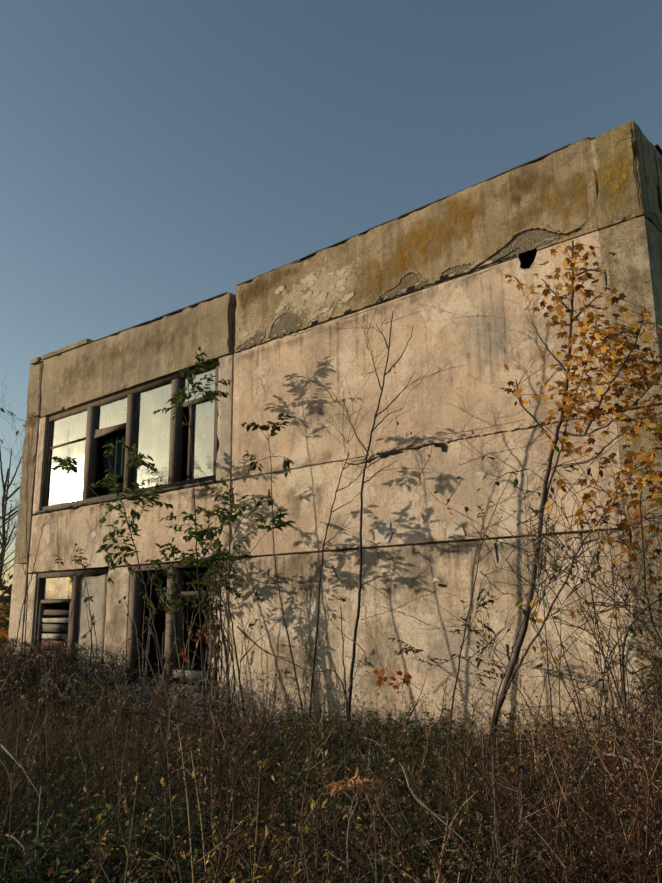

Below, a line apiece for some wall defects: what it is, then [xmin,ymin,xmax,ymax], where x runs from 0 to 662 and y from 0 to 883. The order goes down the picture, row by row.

crack [617,129,662,211]
hole [519,247,538,270]
peeling [235,253,370,350]
flaking render [447,524,465,538]